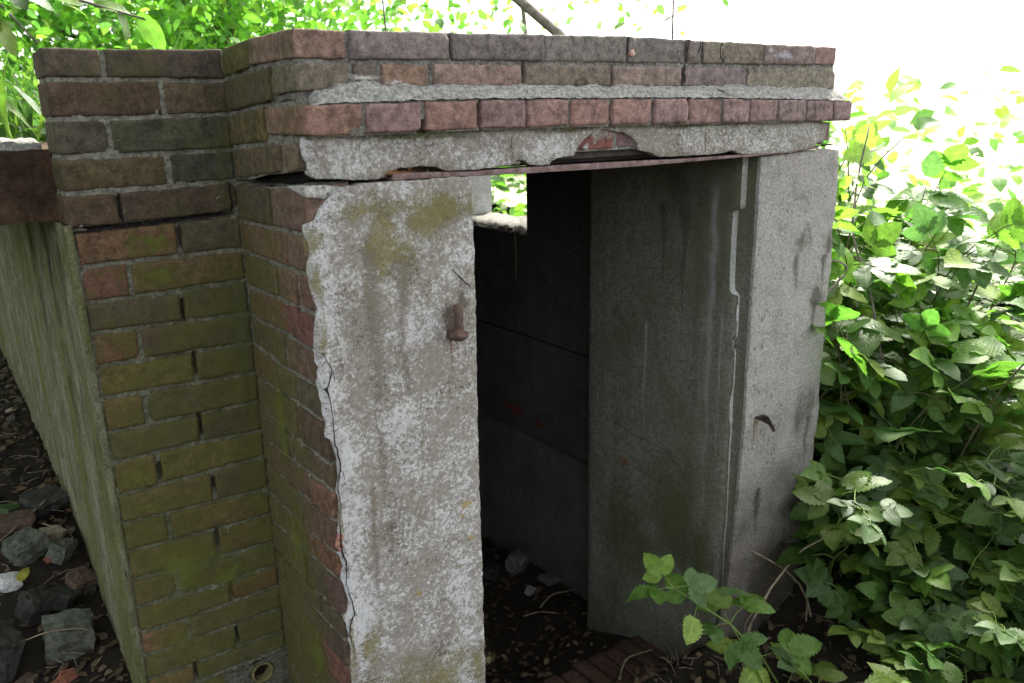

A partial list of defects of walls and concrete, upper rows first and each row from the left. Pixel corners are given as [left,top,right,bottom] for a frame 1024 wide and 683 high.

spalling [582,129,636,150]
peeling [306,174,418,281]
crack [314,348,357,673]